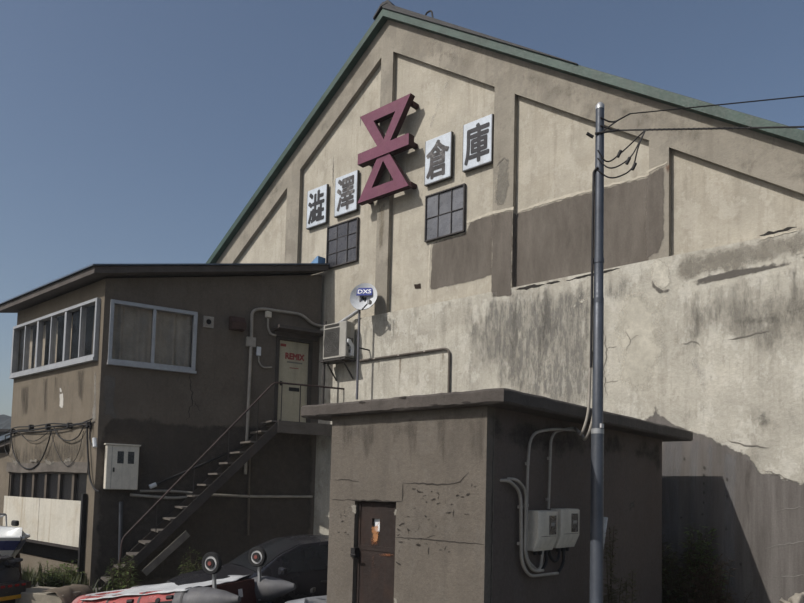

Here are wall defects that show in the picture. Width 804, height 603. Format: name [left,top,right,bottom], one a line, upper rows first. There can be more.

peeling [679,230,804,278]
water stain [472,293,588,401]
crack [603,331,638,392]
crack [332,472,469,502]
crack [398,425,494,573]
peeling [646,409,804,603]